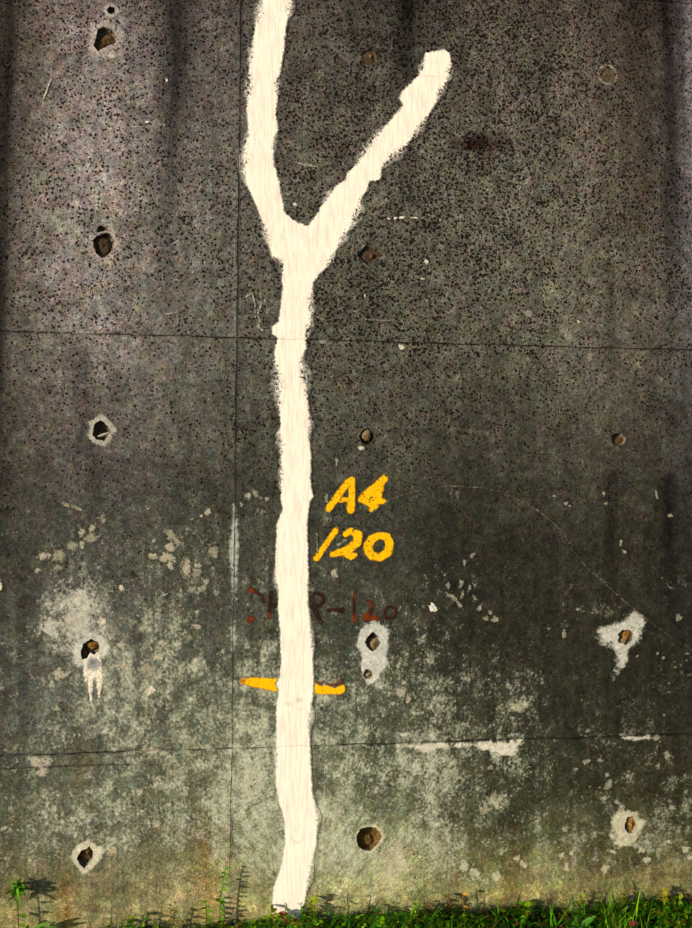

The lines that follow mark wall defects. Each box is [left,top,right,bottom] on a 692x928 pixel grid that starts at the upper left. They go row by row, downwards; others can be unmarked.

water stain [0,0,248,727]
water stain [311,479,340,565]
crack [352,485,692,651]
water stain [575,467,683,684]
water stain [315,676,343,688]
water stain [352,619,392,695]
water stain [17,750,73,779]
water stain [132,700,282,856]
water stain [312,691,542,916]
water stain [605,788,652,854]
water stain [617,731,653,744]